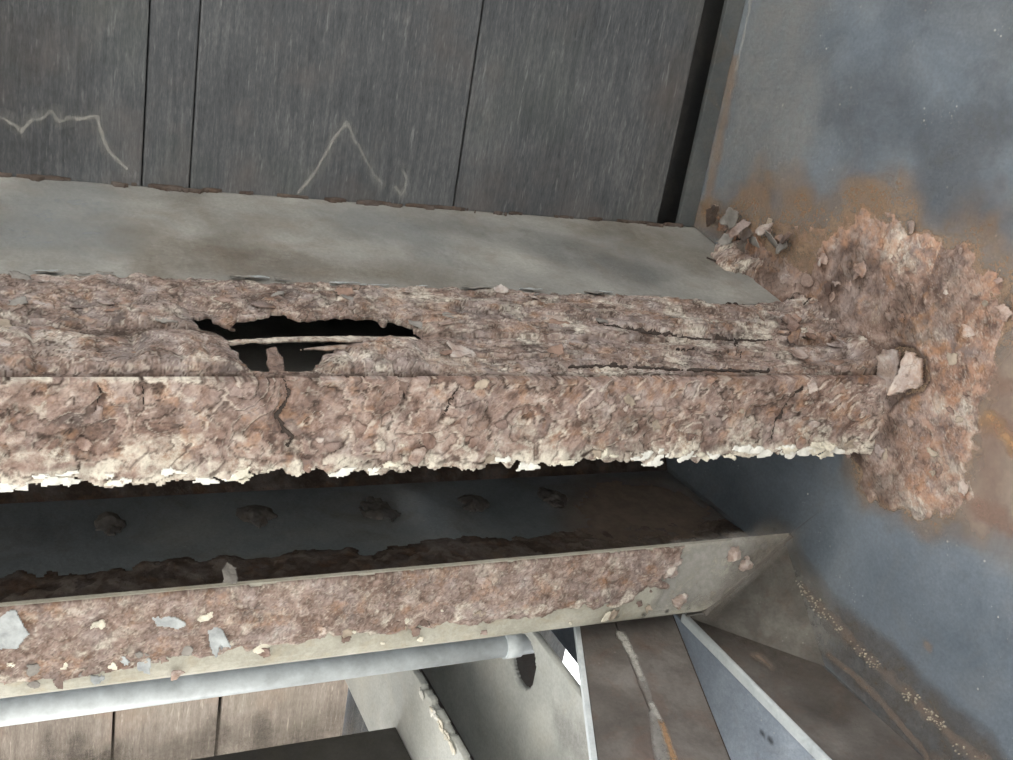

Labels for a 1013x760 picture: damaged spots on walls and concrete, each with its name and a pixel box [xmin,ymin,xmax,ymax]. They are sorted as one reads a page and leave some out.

peeling [266,347,285,371]
corrosion [0,172,1013,533]
corrosion [0,479,750,689]
peeling [0,610,30,650]
peeling [152,616,186,630]
peeling [208,627,231,658]
corrosion [650,703,676,760]